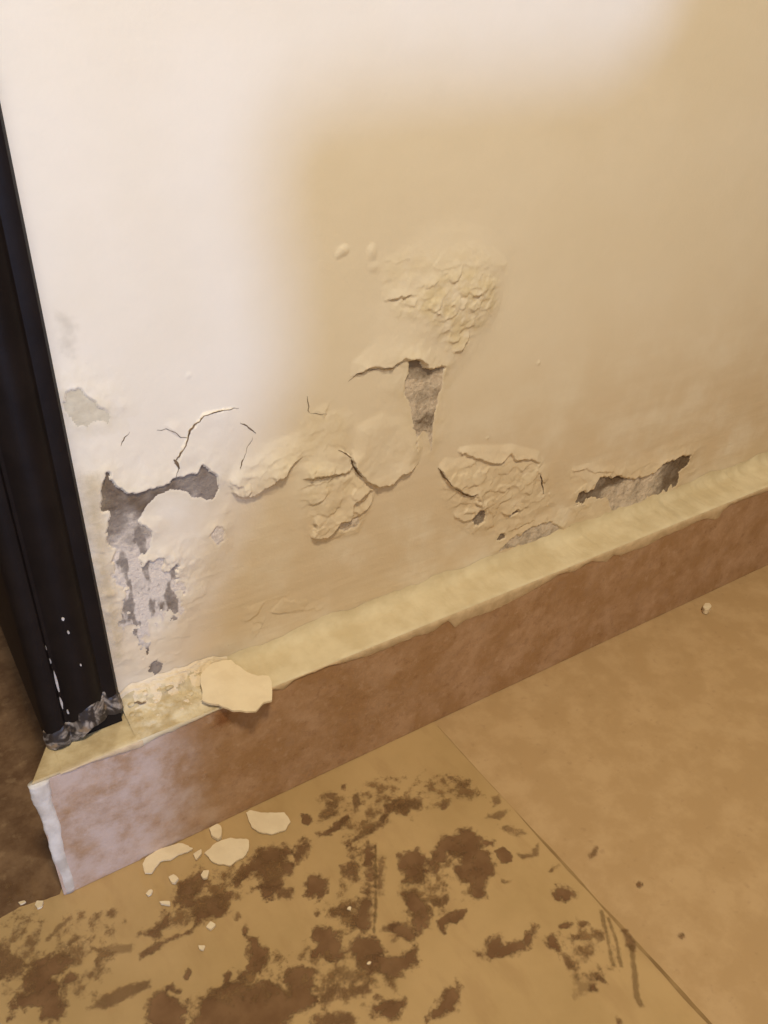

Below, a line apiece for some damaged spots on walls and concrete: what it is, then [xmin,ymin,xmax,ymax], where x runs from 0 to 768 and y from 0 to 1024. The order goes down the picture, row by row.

crack [160,408,256,478]
flaking render [51,343,708,745]